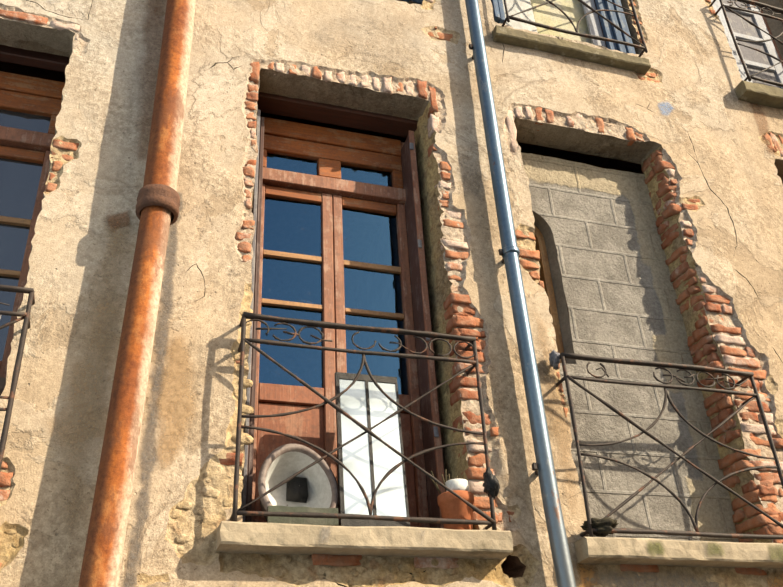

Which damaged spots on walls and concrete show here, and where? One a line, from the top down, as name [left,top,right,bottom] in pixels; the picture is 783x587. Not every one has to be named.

flaking render [0,3,90,57]
flaking render [502,103,650,159]
flaking render [758,131,783,157]
crack [687,132,761,303]
flaking render [515,223,544,288]
flaking render [232,59,521,532]
flaking render [641,148,783,543]
flaking render [554,363,570,418]
flaking render [164,282,541,587]
flaking render [0,457,16,506]
flaking render [0,521,29,573]